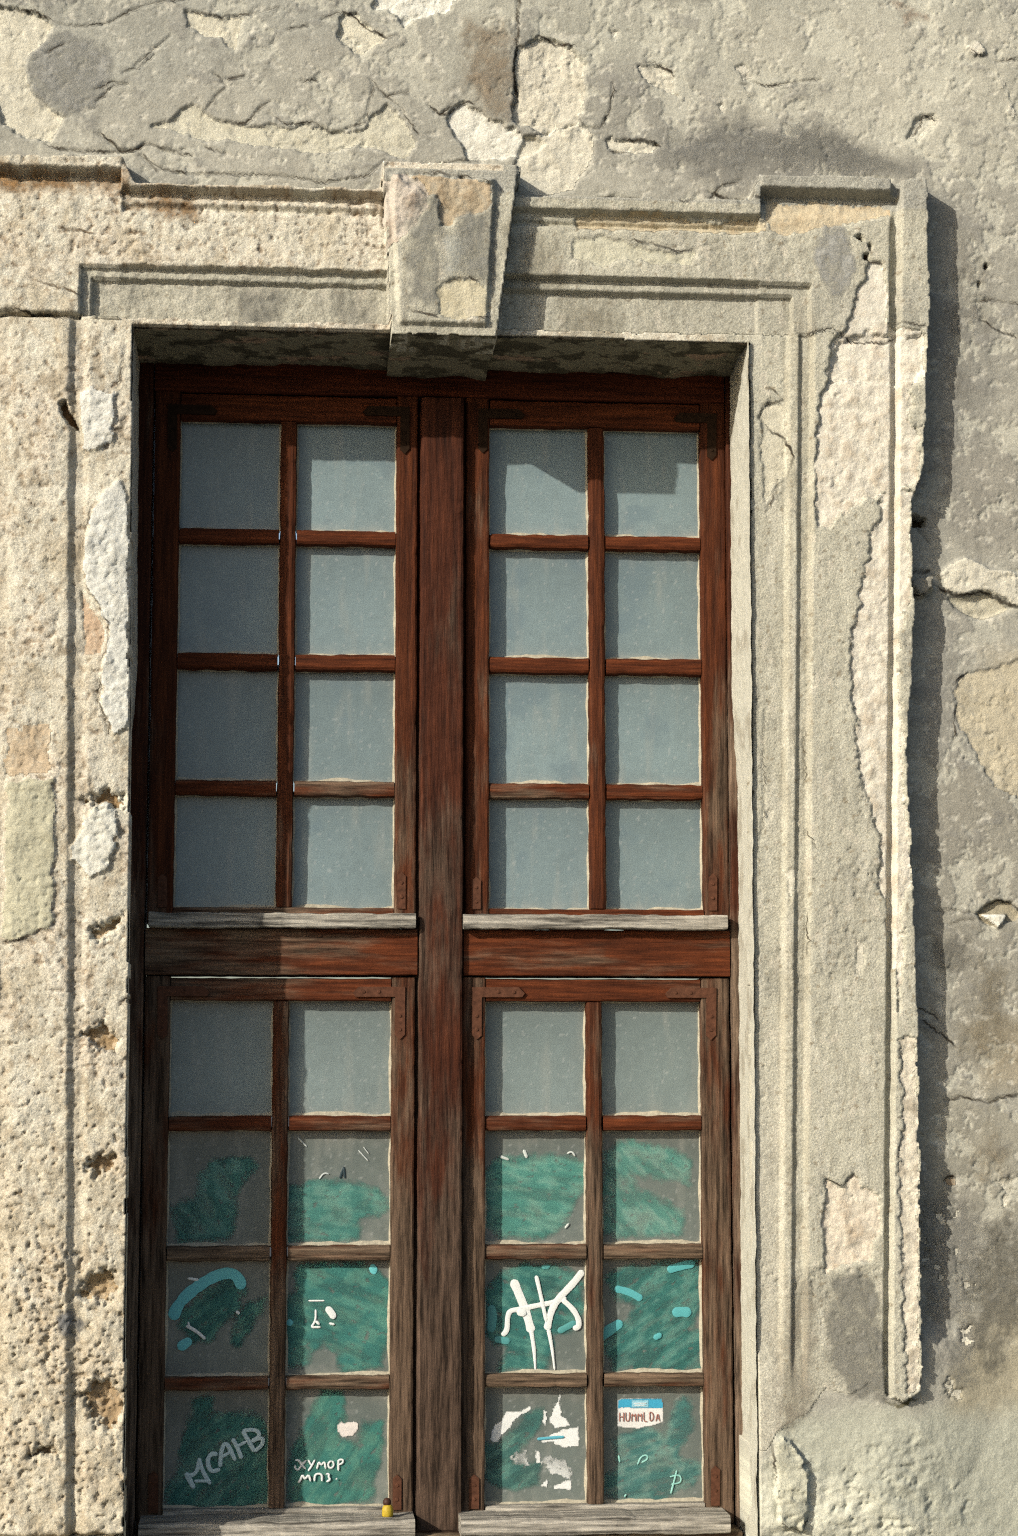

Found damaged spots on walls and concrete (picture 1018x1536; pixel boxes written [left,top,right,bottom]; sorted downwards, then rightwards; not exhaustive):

spalling [0,8,63,142]
crack [47,0,175,53]
crack [45,44,471,184]
spalling [324,0,456,56]
spalling [151,35,656,254]
spalling [412,276,490,320]
peeling [80,386,116,451]
peeling [81,480,130,733]
spalling [814,255,1018,1011]
peeling [70,802,118,877]
spalling [822,1175,882,1274]
spalling [898,1036,976,1394]